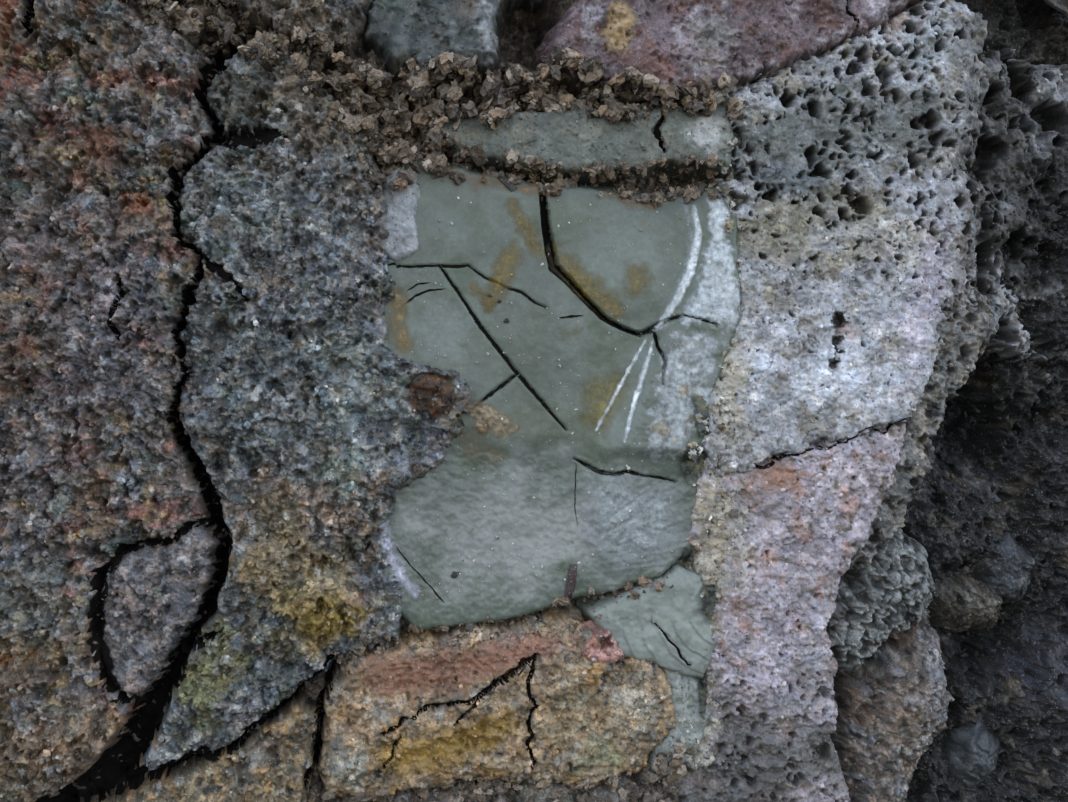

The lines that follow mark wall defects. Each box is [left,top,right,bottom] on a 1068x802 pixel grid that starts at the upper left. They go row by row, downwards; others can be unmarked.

crack [387,176,715,430]
crack [34,31,338,802]
crack [574,458,675,525]
crack [394,544,444,602]
crack [380,653,539,770]